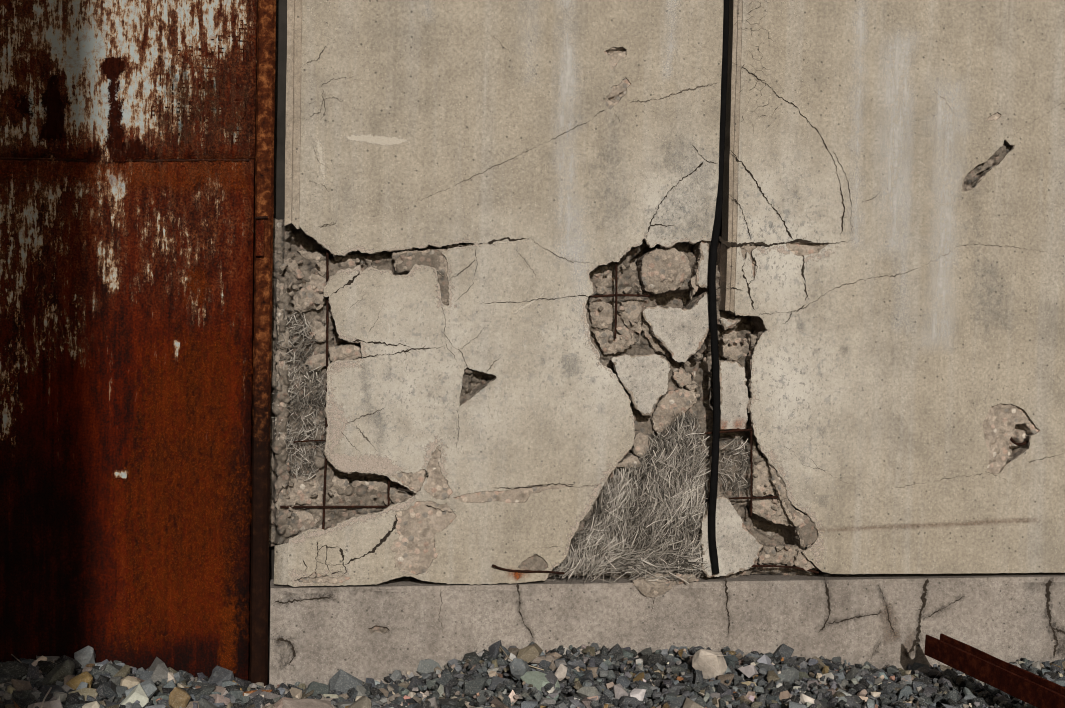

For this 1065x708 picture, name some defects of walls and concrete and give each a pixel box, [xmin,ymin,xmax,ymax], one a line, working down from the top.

rust [15,75,71,145]
rust [83,56,250,166]
crack [307,44,353,117]
spalling [605,47,626,69]
crack [417,0,1053,324]
spalling [962,141,1011,191]
spalling [269,218,571,575]
spalling [518,235,838,586]
spalling [982,403,1039,474]
spalling [288,569,350,586]
crack [818,577,964,658]
crack [1045,580,1065,656]